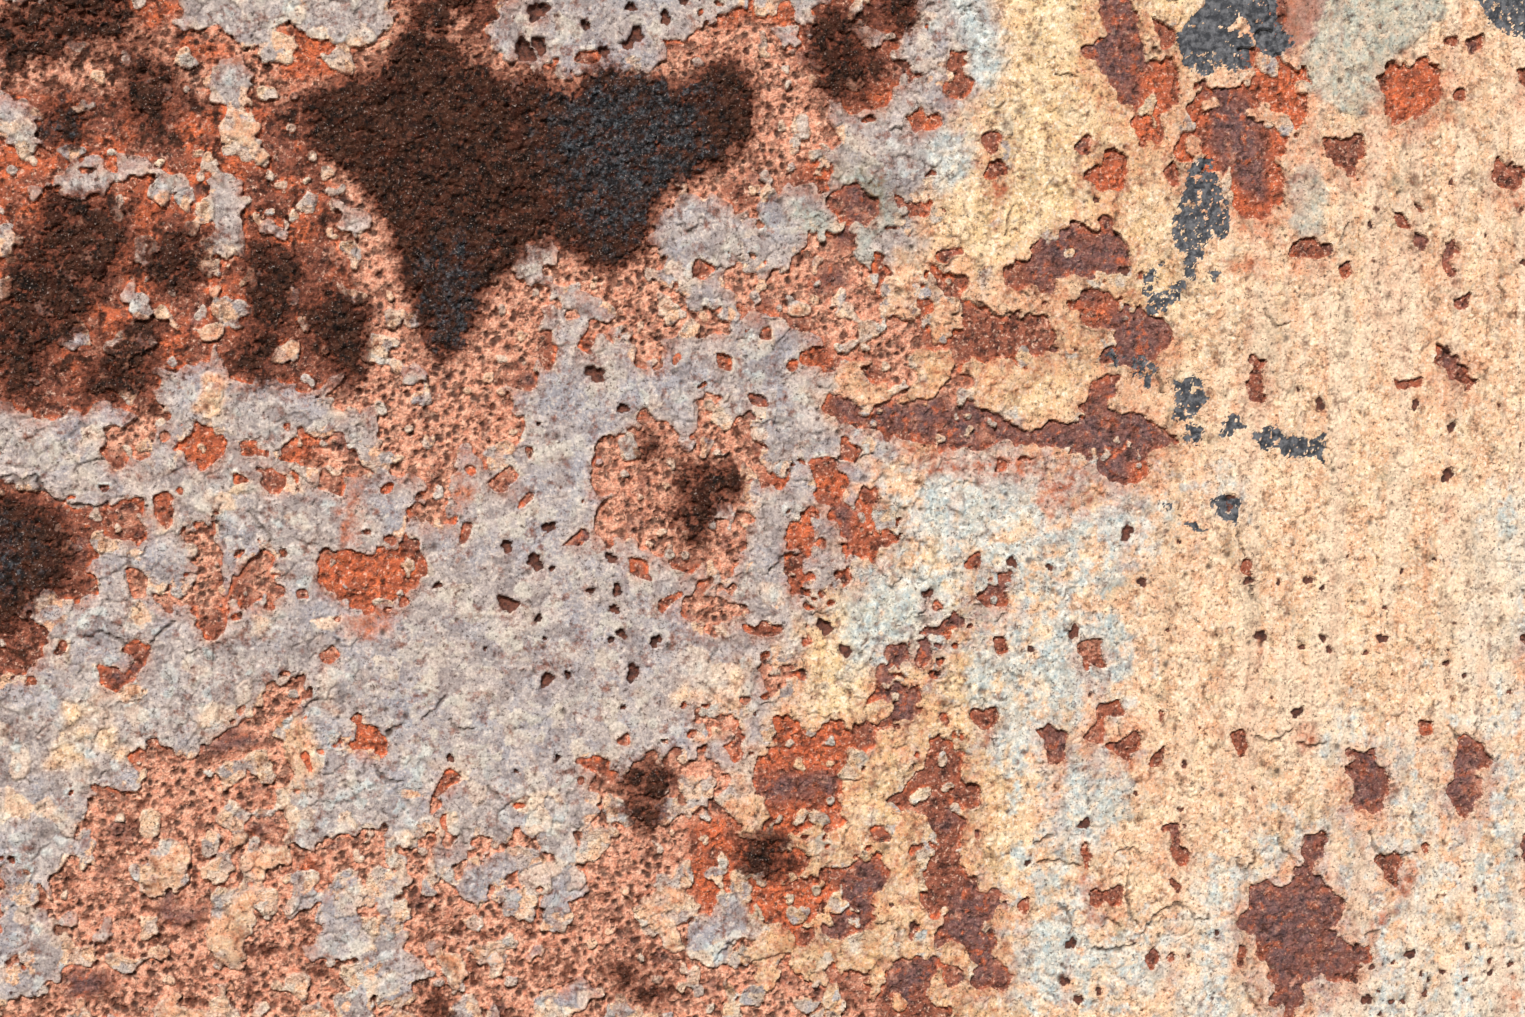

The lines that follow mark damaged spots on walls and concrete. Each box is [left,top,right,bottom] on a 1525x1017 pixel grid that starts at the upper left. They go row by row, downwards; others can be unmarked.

rust [787,0,937,122]
peeling [1371,27,1491,132]
rust [0,0,776,420]
peeling [0,0,1372,623]
rust [0,475,103,650]
rust [612,426,751,566]
rust [891,440,1098,525]
peeling [0,378,1038,1017]
rust [712,817,801,898]
peeling [1029,621,1190,798]
peeling [1214,824,1516,1017]
peeling [1339,742,1398,825]